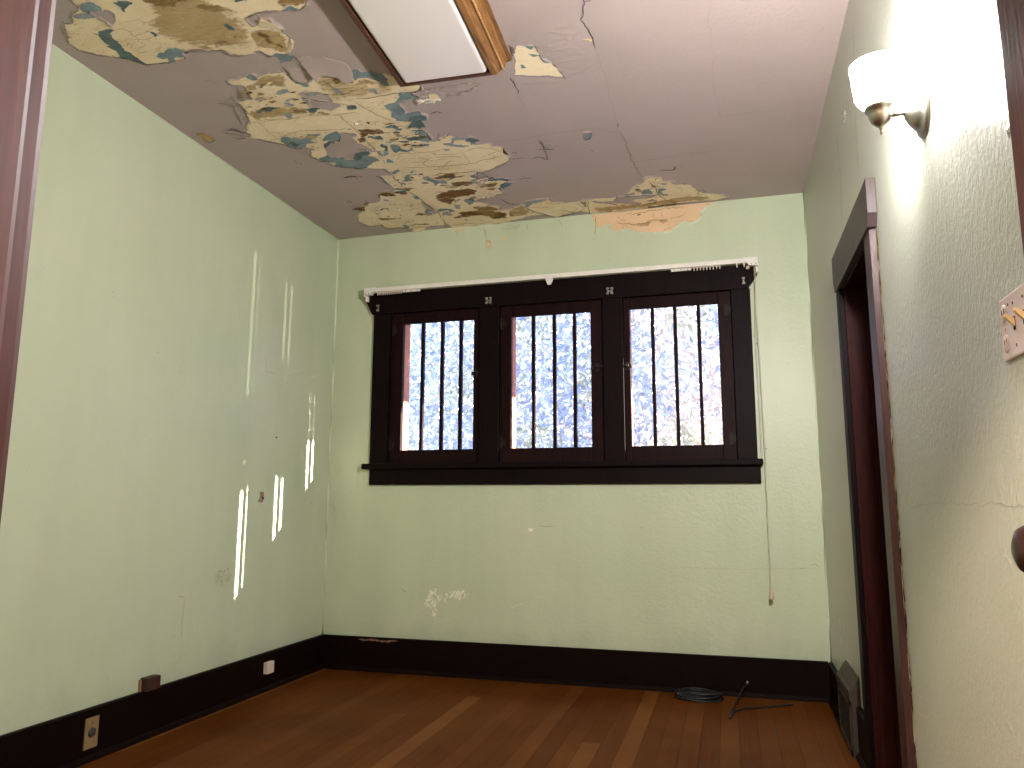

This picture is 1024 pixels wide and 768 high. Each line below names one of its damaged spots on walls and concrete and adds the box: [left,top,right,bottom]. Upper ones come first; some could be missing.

peeling [59,0,731,250]